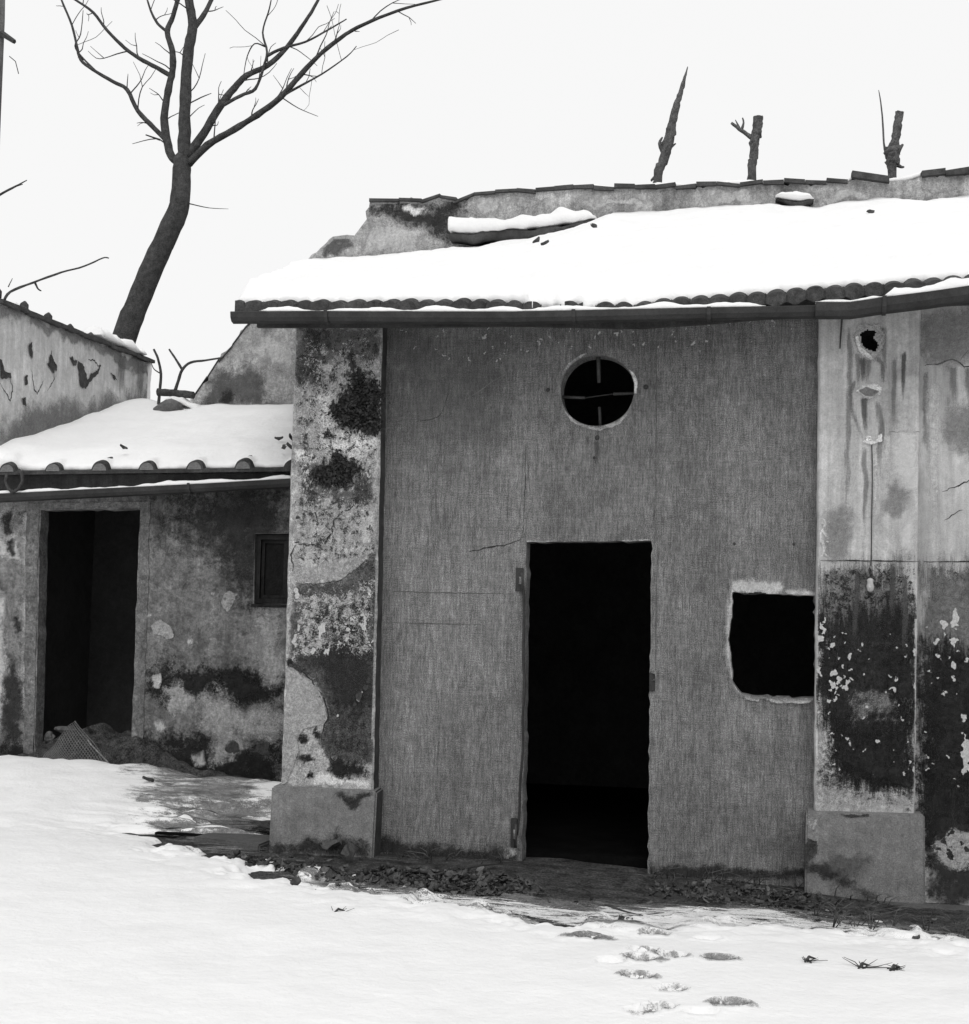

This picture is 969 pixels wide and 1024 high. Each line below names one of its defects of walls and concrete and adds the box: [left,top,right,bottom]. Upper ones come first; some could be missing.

flaking render [0,350,57,406]
flaking render [70,356,117,389]
flaking render [853,323,886,361]
flaking render [856,383,883,398]
crack [925,355,969,367]
crack [469,430,526,552]
water stain [143,328,380,810]
peeling [310,605,374,654]
water stain [816,306,969,905]
water stain [0,660,34,756]